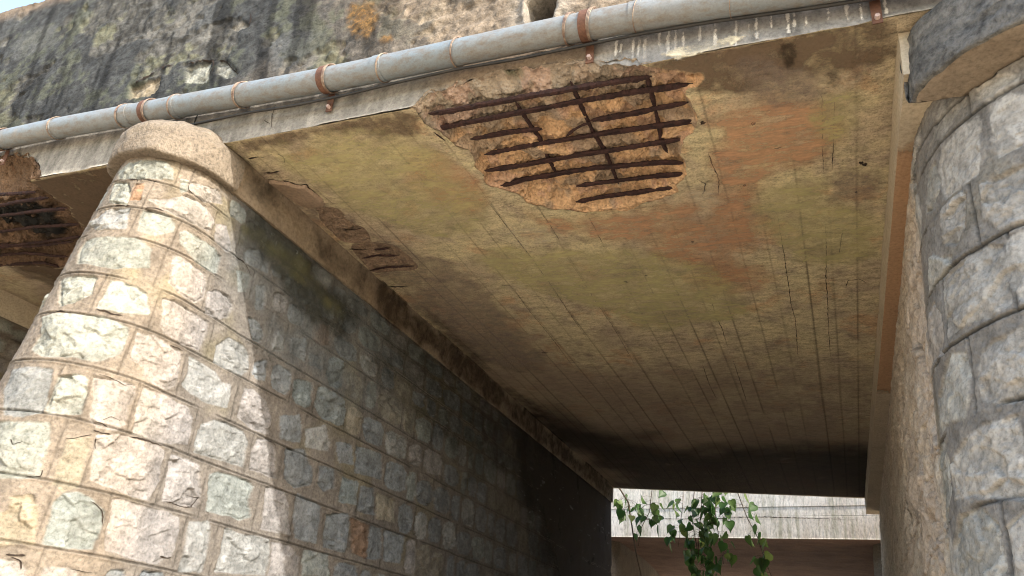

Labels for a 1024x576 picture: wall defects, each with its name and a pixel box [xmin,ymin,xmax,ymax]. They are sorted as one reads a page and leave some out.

leakage [614,0,891,93]
spalling [0,152,84,268]
spalling [316,207,418,273]
spalling [409,57,706,213]
crack [697,153,720,195]
crack [778,219,798,354]
crack [821,96,835,172]
crack [825,227,865,356]